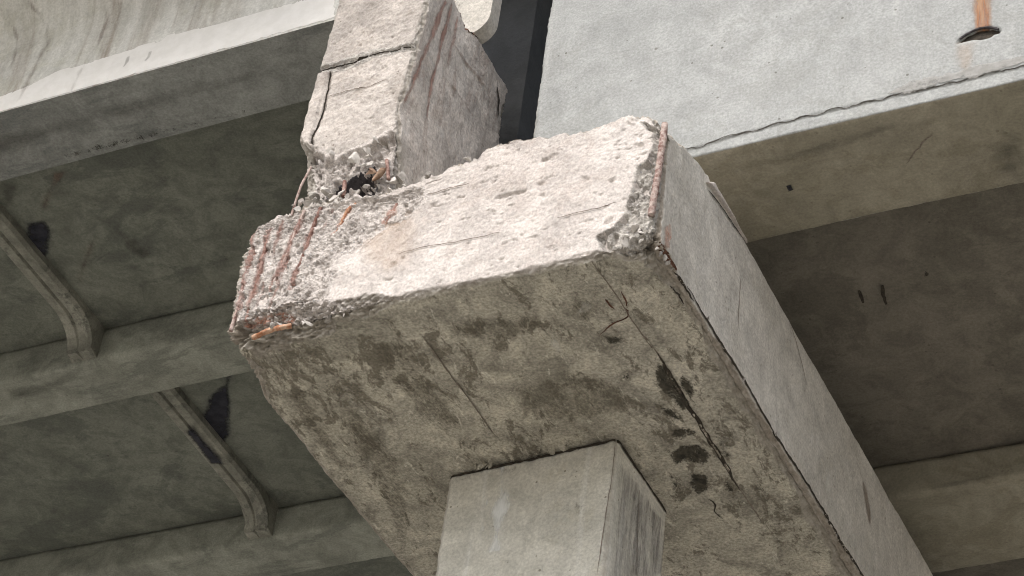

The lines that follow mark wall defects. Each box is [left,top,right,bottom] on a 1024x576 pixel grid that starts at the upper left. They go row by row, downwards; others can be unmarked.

rust [975,0,990,32]
crack [311,42,416,144]
crack [686,65,1024,149]
water stain [28,222,50,256]
spalling [229,129,432,340]
spalling [595,121,668,256]
water stain [187,430,223,464]
water stain [203,379,230,441]
crack [422,336,494,434]
crack [590,258,772,533]
water stain [656,365,711,494]
crack [655,242,864,576]